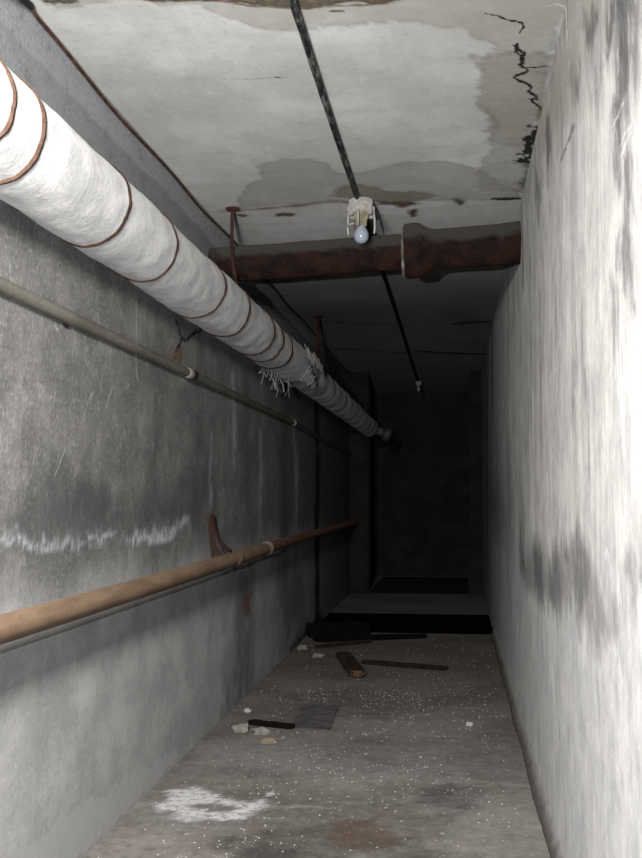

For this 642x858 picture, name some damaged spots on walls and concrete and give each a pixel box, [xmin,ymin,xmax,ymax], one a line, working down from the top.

damp [149,0,392,12]
crack [485,13,545,110]
damp [326,184,433,217]
damp [0,477,214,552]
damp [155,787,274,822]